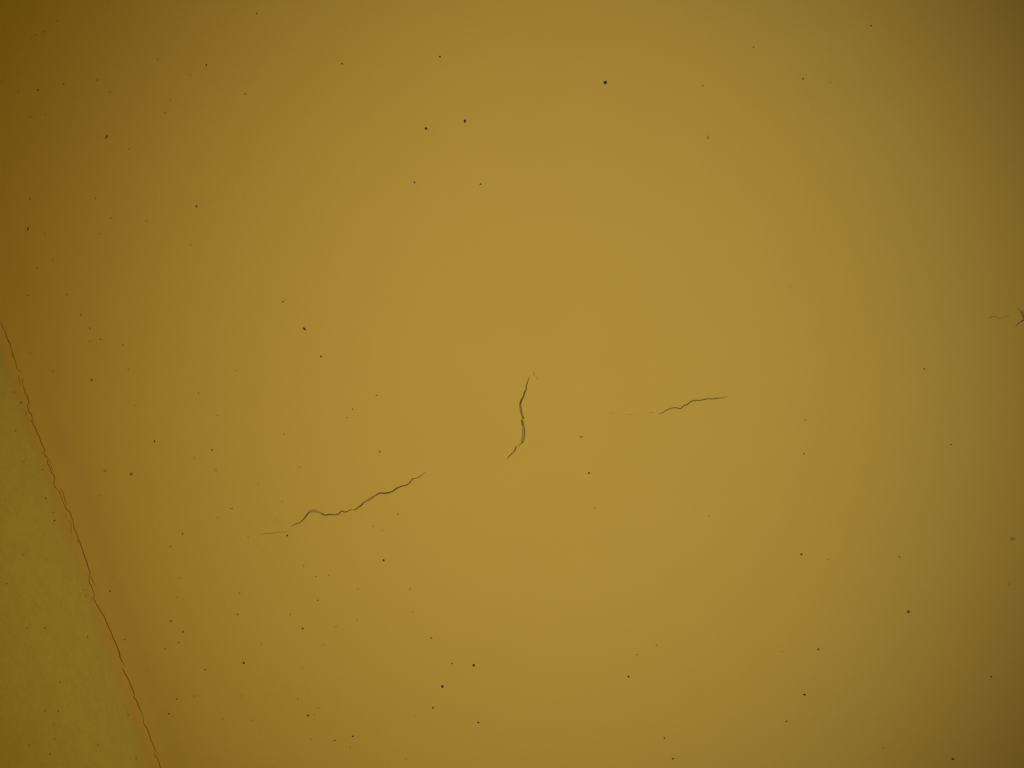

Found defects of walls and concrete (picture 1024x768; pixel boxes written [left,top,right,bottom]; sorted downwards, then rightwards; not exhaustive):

crack [507,371,539,459]
crack [609,396,727,415]
crack [0,322,161,768]
crack [262,472,425,535]